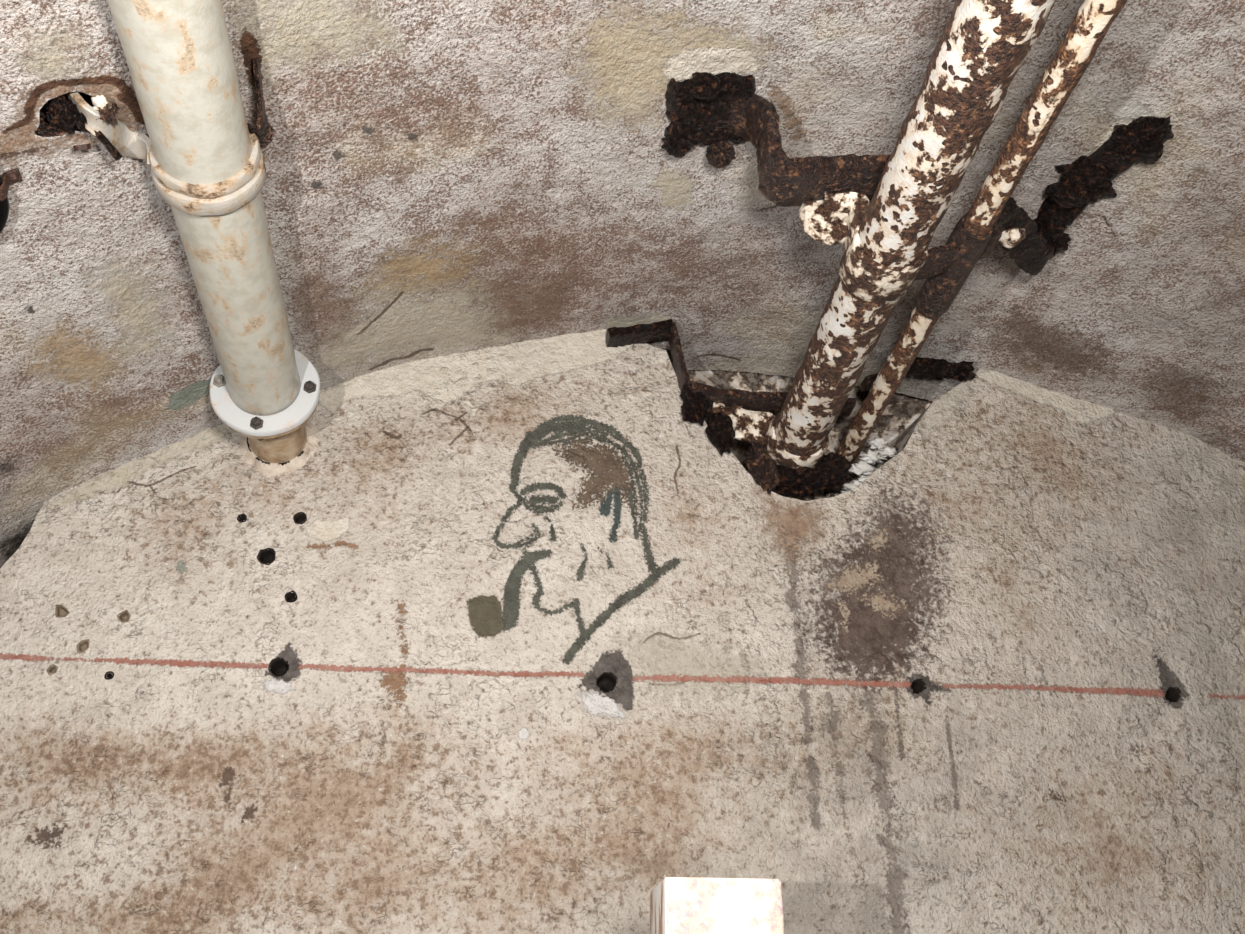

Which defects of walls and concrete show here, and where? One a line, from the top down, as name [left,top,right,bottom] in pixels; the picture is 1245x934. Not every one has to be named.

rust [239,29,263,89]
flaking render [34,91,94,137]
water stain [798,484,952,760]
water stain [946,723,958,810]